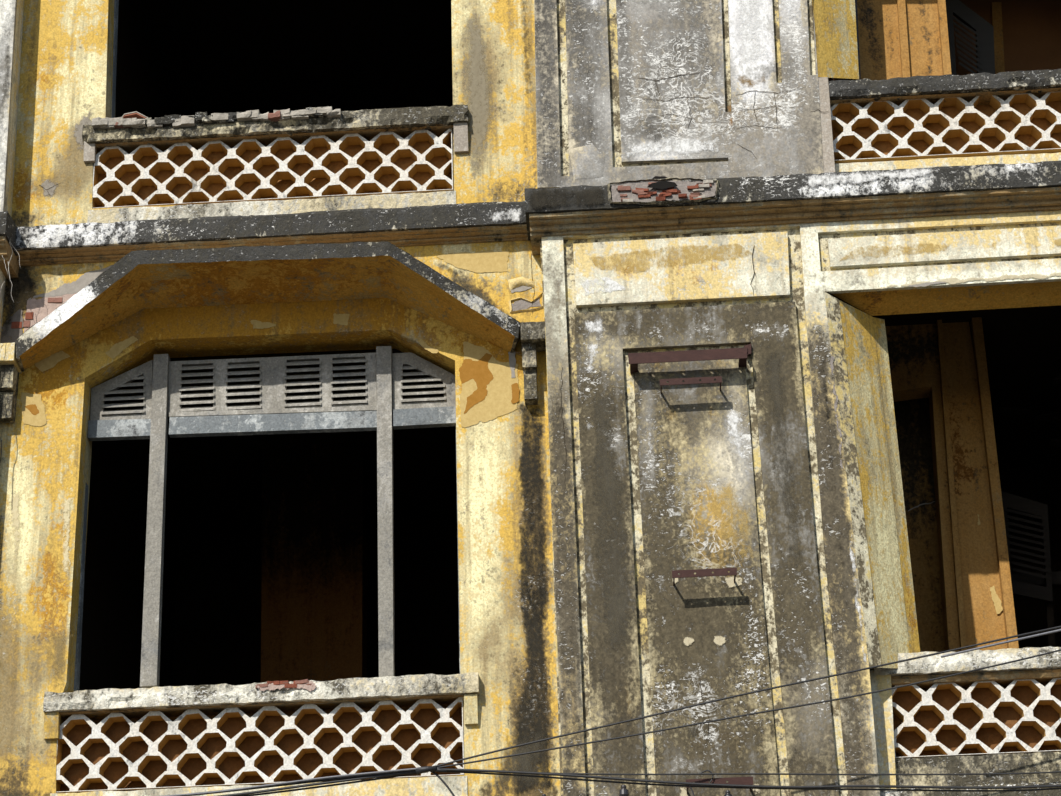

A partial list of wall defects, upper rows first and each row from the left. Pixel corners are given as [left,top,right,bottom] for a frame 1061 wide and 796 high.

water stain [463,13,490,175]
flaking render [607,176,720,205]
peeling [436,250,509,273]
flaking render [0,263,113,343]
peeling [459,342,520,428]
efflorescence [728,410,742,457]
water stain [594,398,629,649]
water stain [496,404,552,795]
flaking render [256,679,316,691]